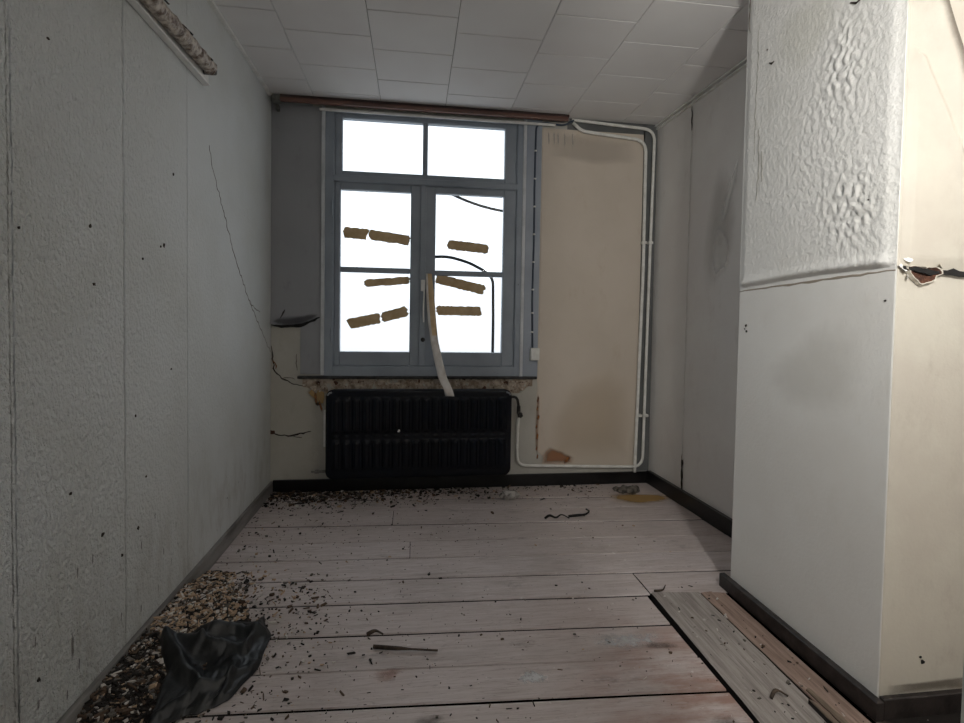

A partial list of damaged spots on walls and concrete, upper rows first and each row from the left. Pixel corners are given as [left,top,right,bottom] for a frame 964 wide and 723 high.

crack [209,145,319,406]
crack [903,266,964,277]
spalling [302,379,533,394]
crack [270,430,311,438]